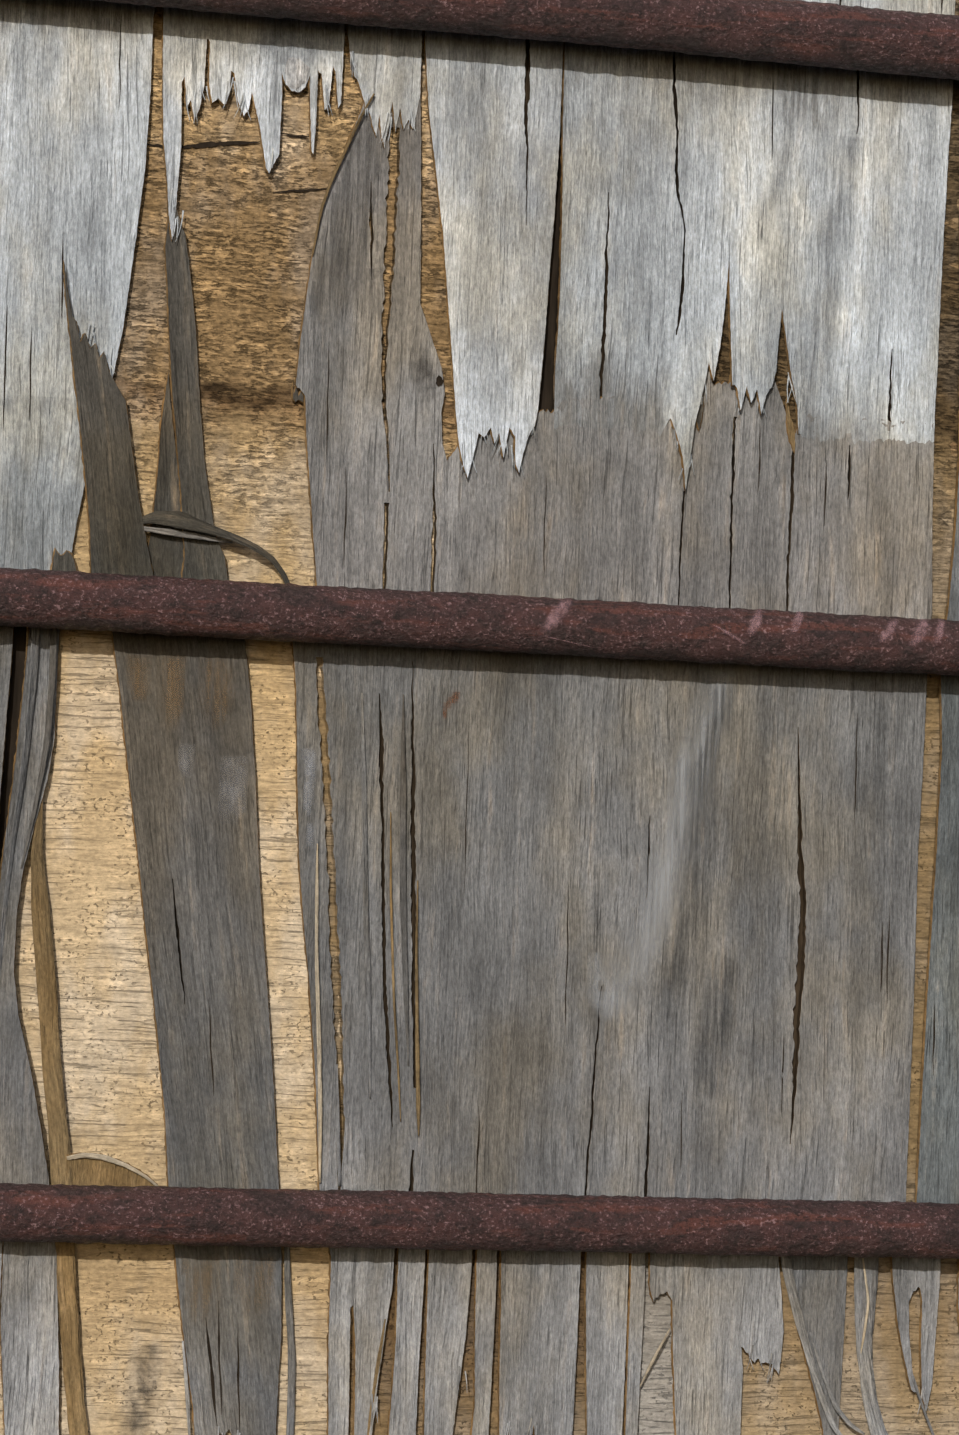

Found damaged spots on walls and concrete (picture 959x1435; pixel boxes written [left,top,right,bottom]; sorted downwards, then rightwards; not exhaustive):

peeling [50,7,564,581]
crack [524,39,563,412]
crack [672,52,686,335]
peeling [696,396,704,432]
peeling [785,397,795,454]
peeling [0,626,61,1185]
crack [781,734,806,1142]
peeling [66,1152,158,1187]
peeling [0,1241,60,1435]
peeling [326,1247,848,1435]
peeling [890,1257,959,1411]